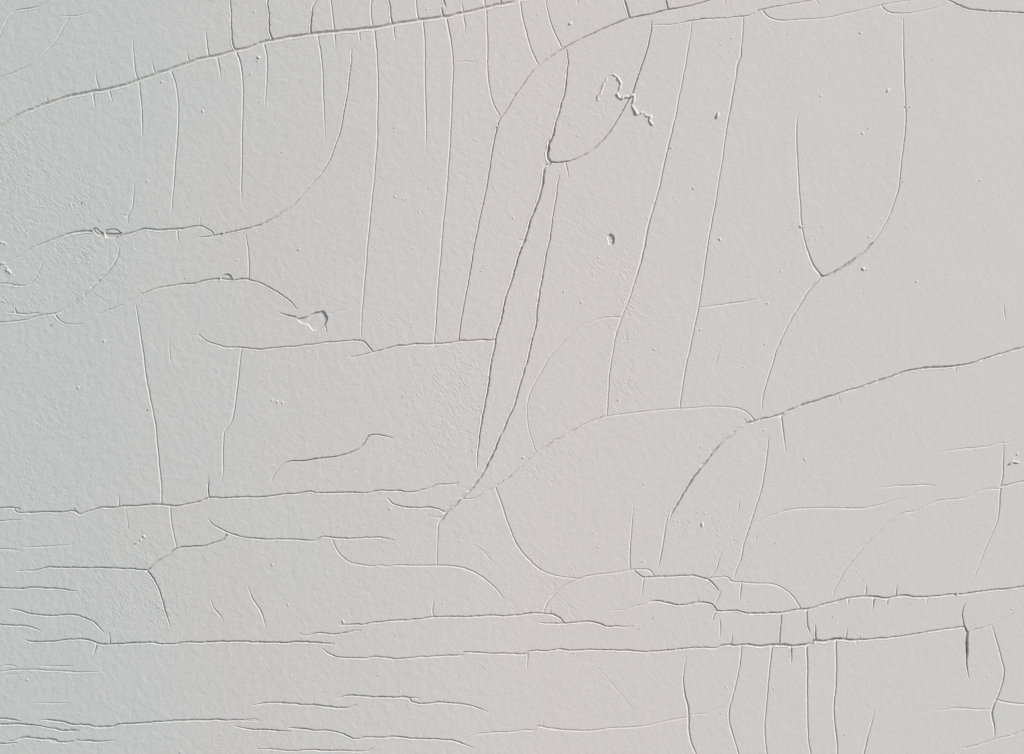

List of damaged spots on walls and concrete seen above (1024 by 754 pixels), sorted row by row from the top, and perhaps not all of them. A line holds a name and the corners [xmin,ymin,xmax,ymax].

crack [0,0,712,483]
crack [0,175,1024,754]
crack [526,0,1024,452]